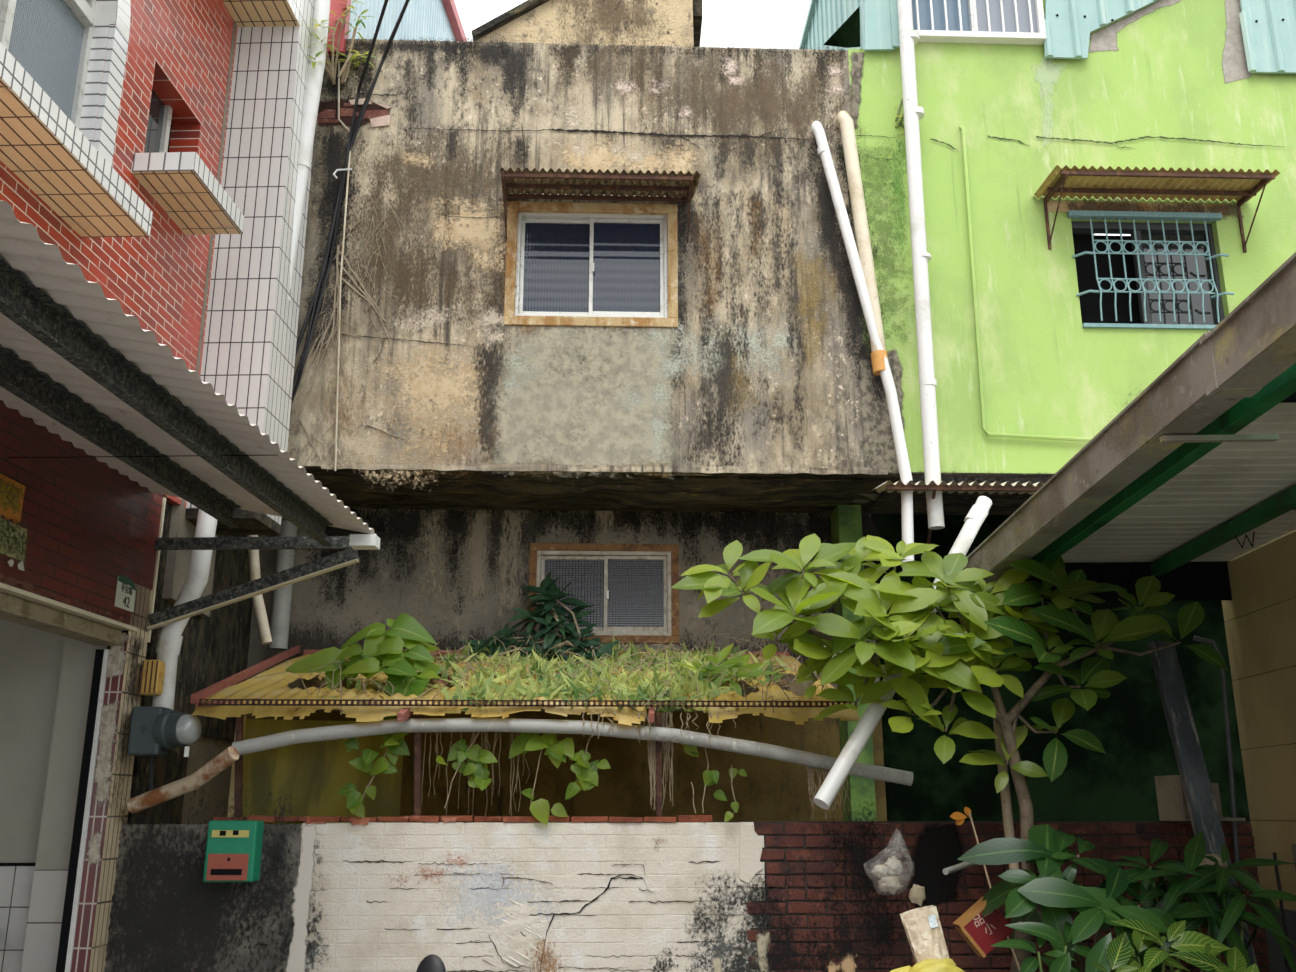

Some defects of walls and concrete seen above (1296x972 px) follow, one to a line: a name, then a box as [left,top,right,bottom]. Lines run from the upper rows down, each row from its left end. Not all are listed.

peeling [1089,0,1180,52]
peeling [1222,0,1251,84]
leakage [304,0,914,466]
leakage [277,509,832,664]
leakage [861,513,888,540]
mould [103,790,329,972]
crack [343,860,740,972]
leakage [651,802,946,972]